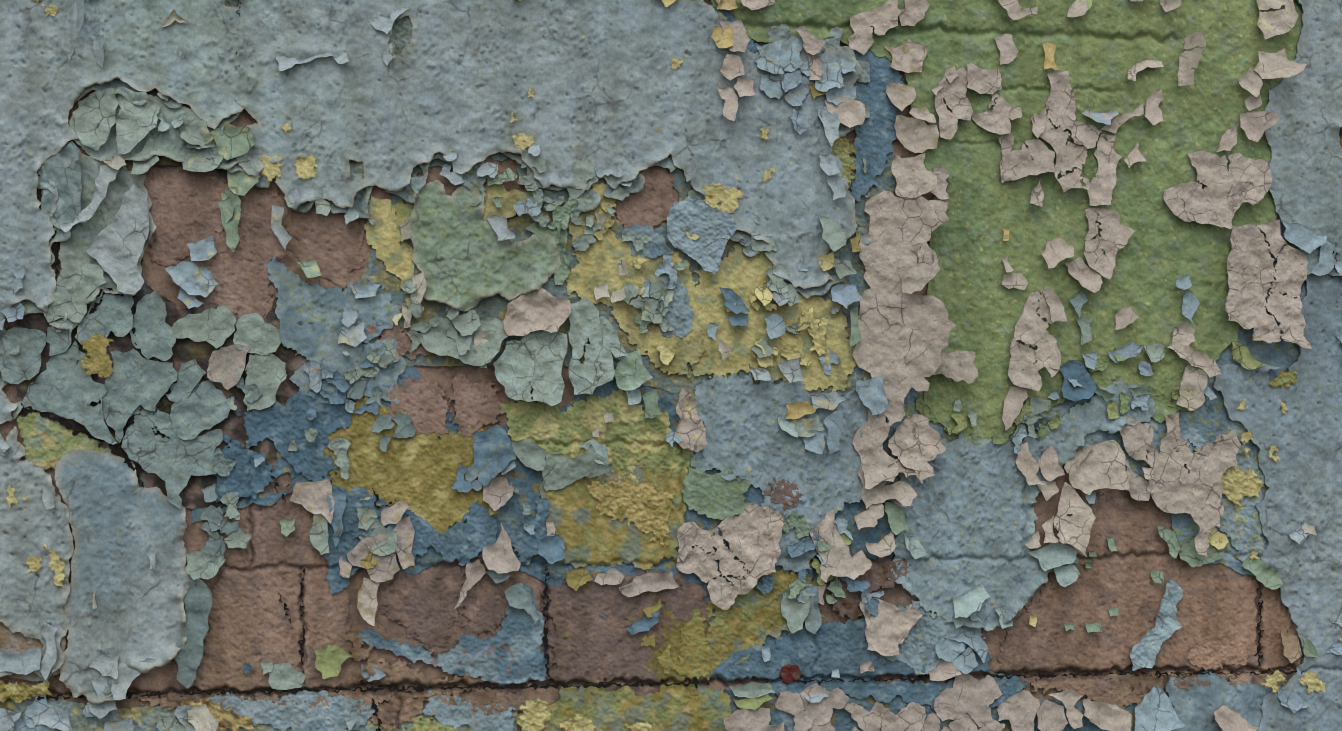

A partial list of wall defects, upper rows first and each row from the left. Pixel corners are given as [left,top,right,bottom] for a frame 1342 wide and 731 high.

peeling [711,0,930,200]
peeling [997,0,1038,20]
peeling [1067,0,1092,18]
peeling [1127,30,1206,86]
peeling [1159,0,1183,12]
peeling [1163,0,1342,370]
flaking render [0,86,840,515]
peeling [136,34,1164,731]
flaking render [723,256,1342,731]
peeling [0,621,73,731]
peeling [83,652,141,731]